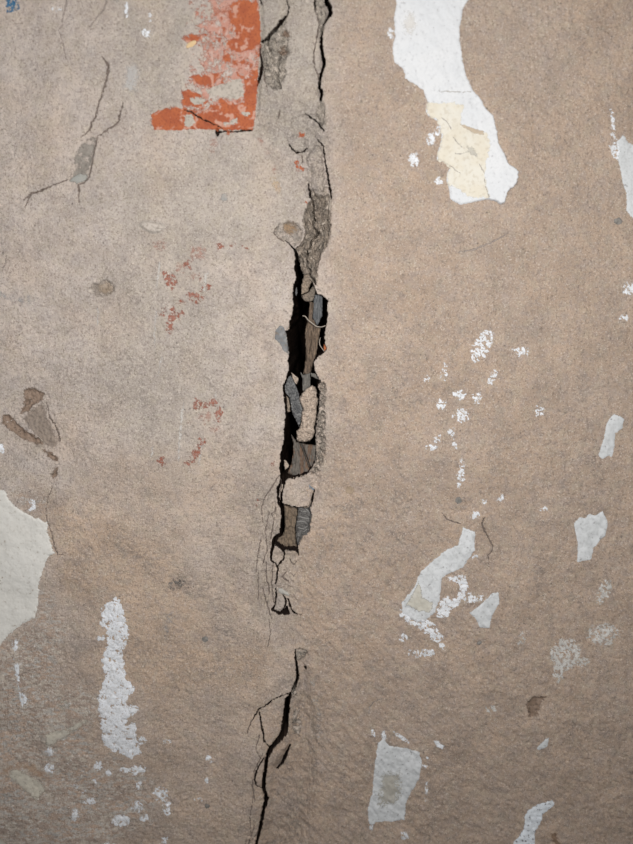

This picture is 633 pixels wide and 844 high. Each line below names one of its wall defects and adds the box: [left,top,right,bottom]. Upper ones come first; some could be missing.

crack [257,0,290,91]
crack [289,0,333,201]
peeling [609,109,620,161]
spalling [2,387,58,478]
crack [255,224,331,647]
peeling [399,574,483,657]
crack [245,648,308,844]